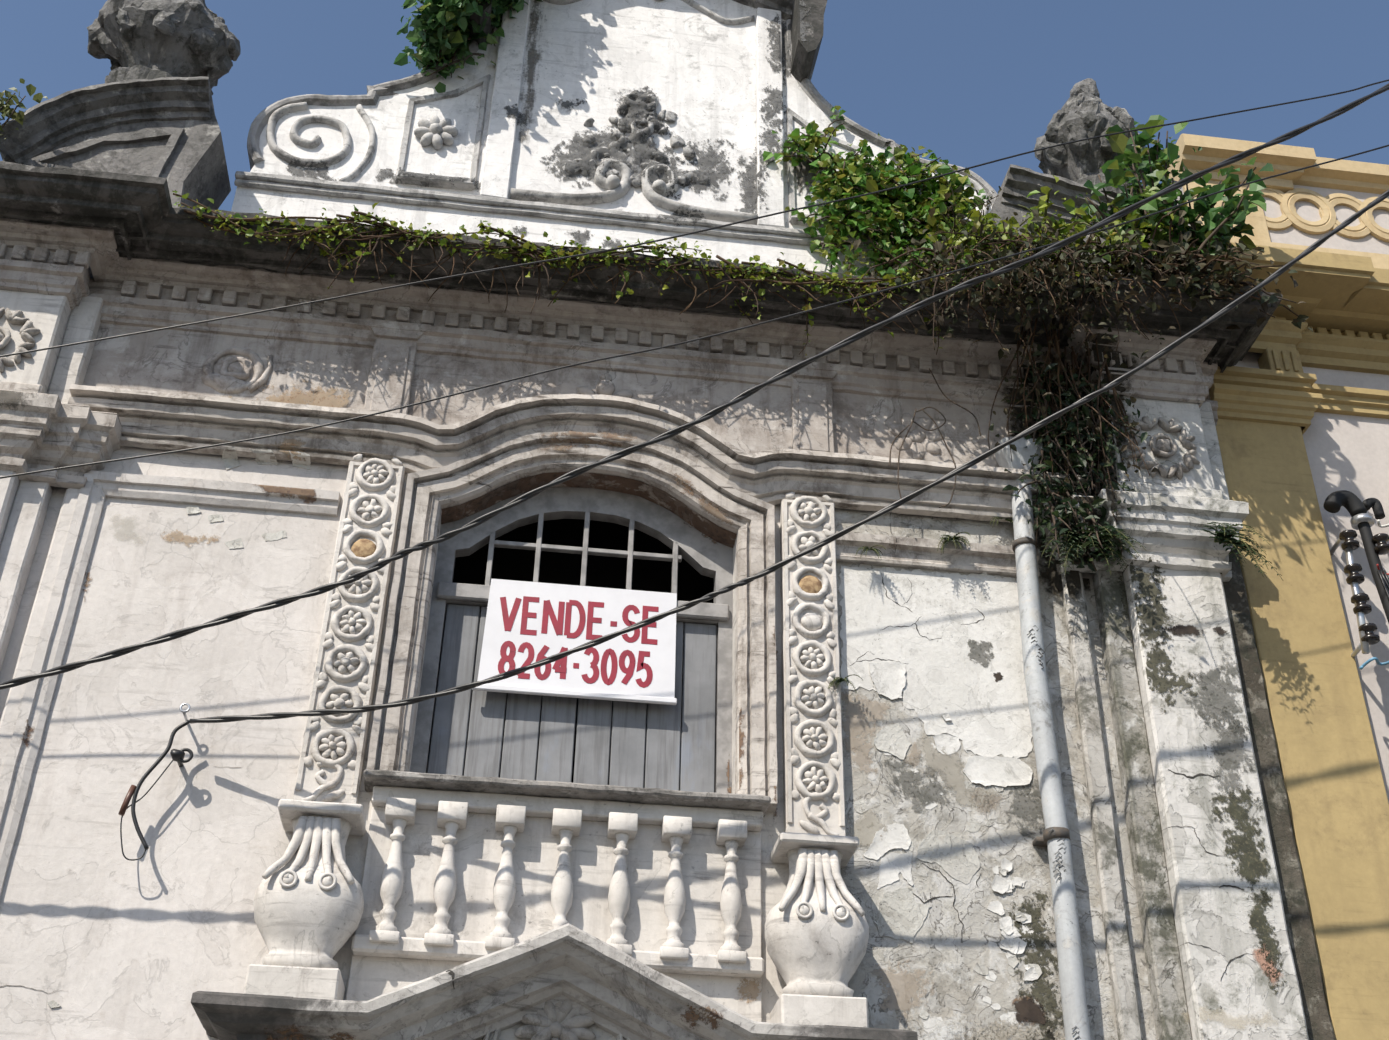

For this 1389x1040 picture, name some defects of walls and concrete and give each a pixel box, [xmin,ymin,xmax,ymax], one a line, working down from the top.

crack [849,513,984,666]
damp [1185,642,1257,796]
peeling [838,565,1081,1040]